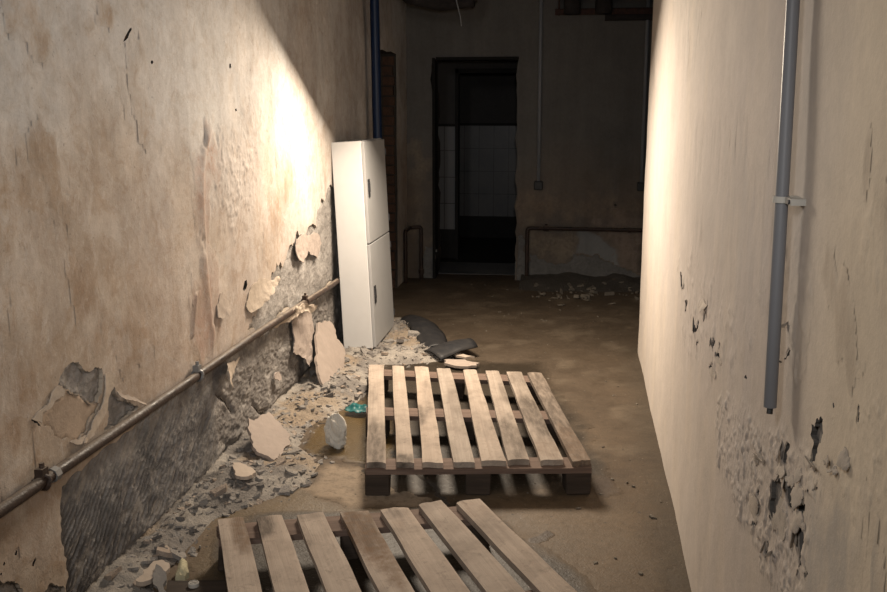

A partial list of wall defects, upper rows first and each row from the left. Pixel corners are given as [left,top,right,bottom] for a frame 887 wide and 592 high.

damp [0,0,57,69]
damp [0,469,71,584]
damp [0,114,159,500]
spalling [32,186,343,592]
spalling [515,231,641,280]
peeling [714,389,850,592]